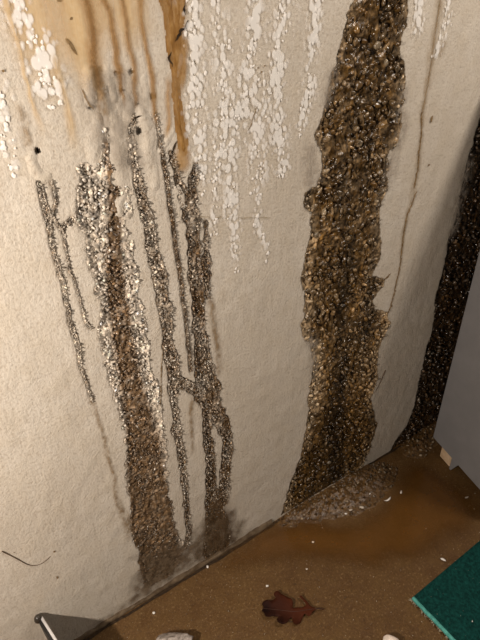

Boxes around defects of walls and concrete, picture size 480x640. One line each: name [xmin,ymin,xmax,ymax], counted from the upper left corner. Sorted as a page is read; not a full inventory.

corrosion [3,0,50,53]
efflorescence [2,0,66,110]
corrosion [63,0,106,114]
efflorescence [298,0,323,138]
efflorescence [0,91,18,178]
efflorescence [184,0,291,273]
crack [380,3,440,314]
corrosion [102,0,234,587]
damp [130,502,239,602]